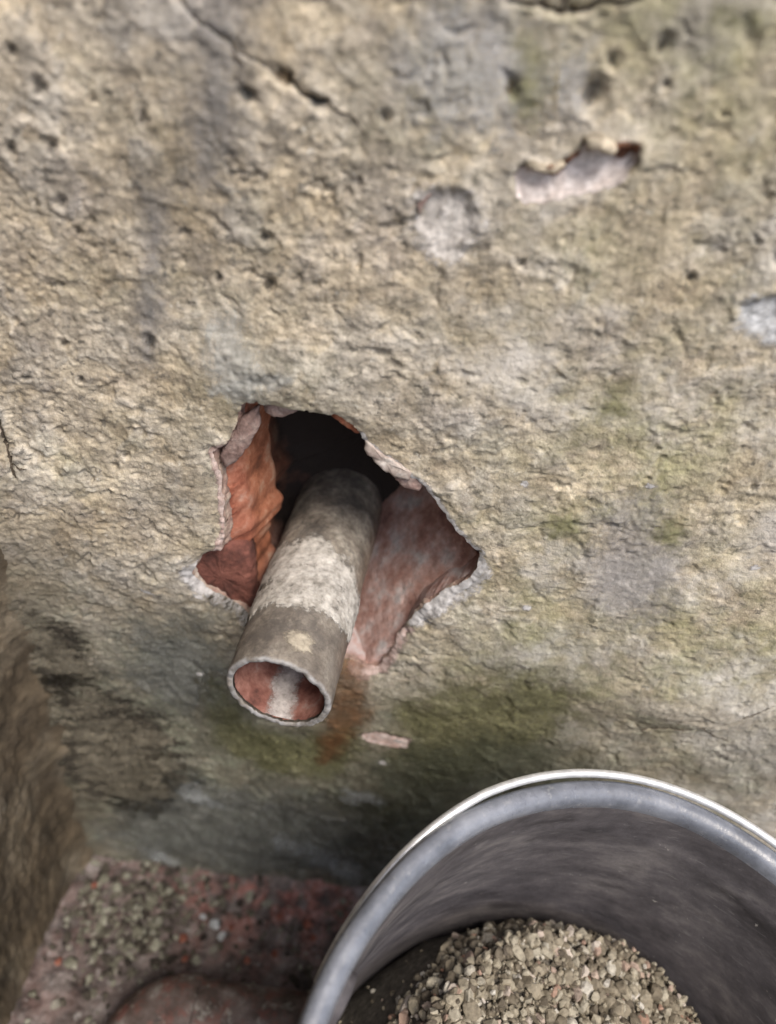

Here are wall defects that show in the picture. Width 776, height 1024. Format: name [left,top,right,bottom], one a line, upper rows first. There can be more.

crack [181,0,366,134]
spalling [514,132,641,204]
spalling [179,402,492,681]
water stain [24,610,417,886]
rust [323,659,363,760]